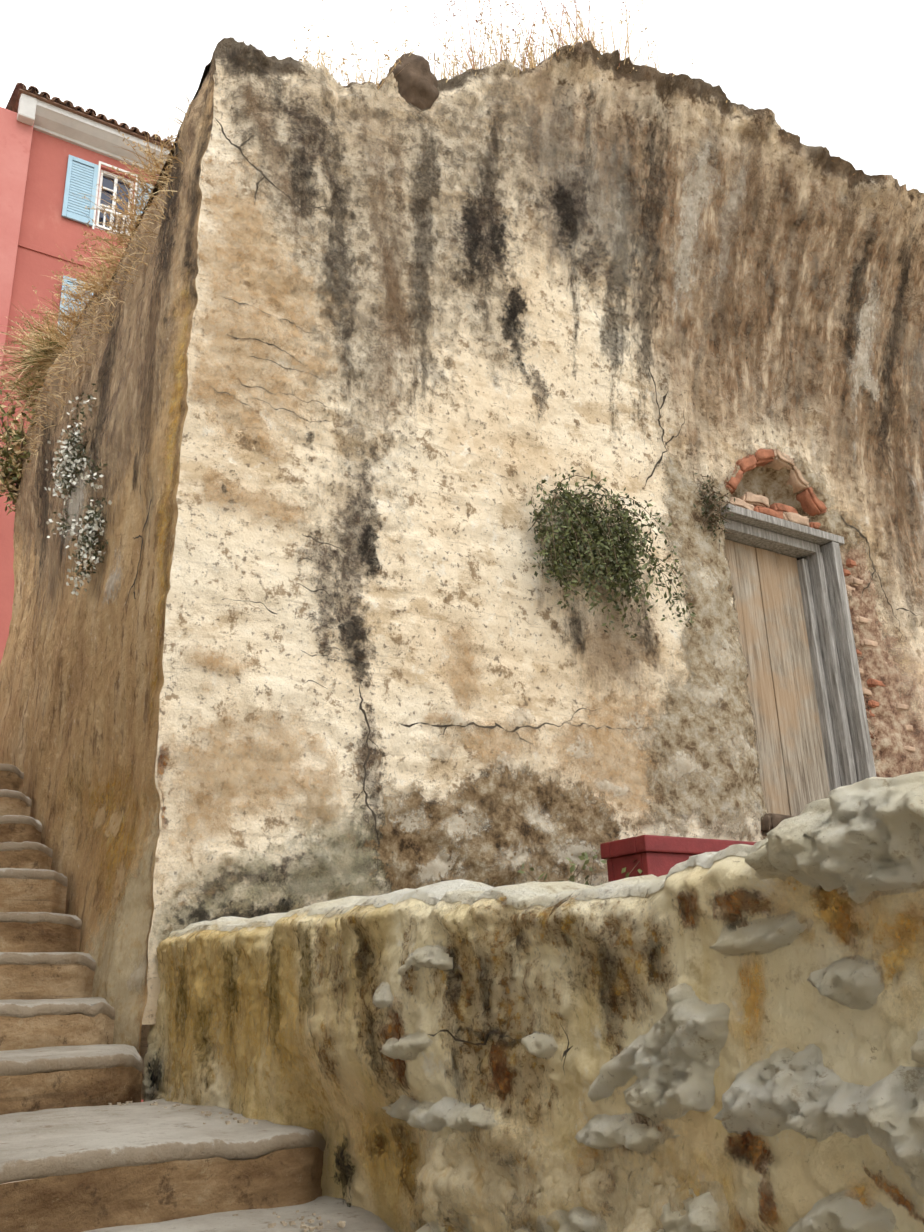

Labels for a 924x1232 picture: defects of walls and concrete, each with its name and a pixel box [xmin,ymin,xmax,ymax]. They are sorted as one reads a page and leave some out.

damp [15,41,924,687]
damp [159,712,341,856]
crack [298,534,348,689]
crack [352,685,384,880]
damp [350,705,387,836]
crack [399,708,662,746]
spalling [353,440,924,892]